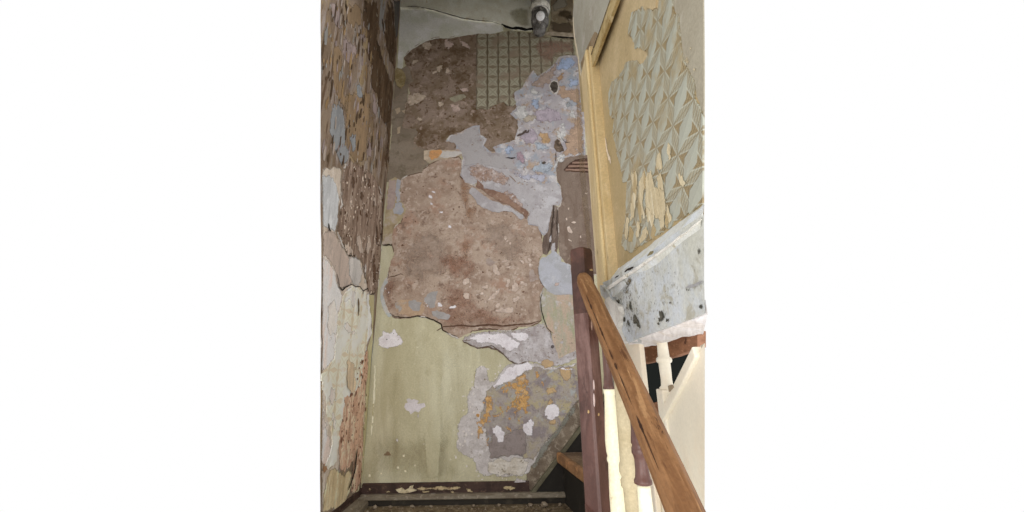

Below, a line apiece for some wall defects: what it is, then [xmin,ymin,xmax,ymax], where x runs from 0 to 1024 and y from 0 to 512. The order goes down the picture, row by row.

crack [402,1,610,54]
flaking render [673,0,705,115]
flaking render [322,0,631,494]